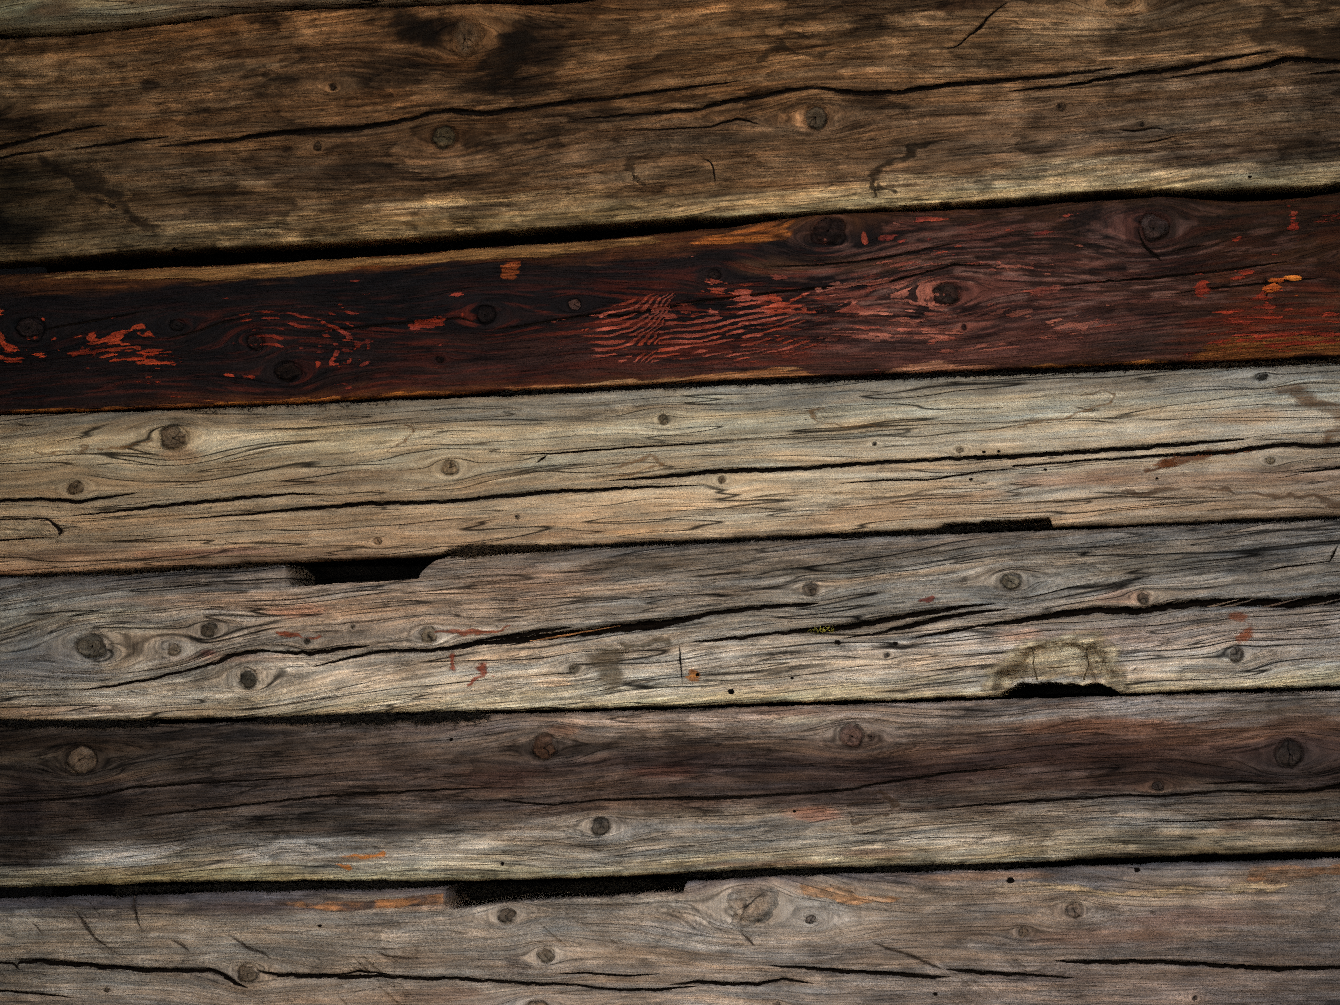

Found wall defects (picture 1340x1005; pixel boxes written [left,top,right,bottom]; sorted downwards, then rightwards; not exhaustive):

crack [947,2,1007,49]
crack [0,51,1340,180]
peeling [48,236,660,282]
peeling [691,219,795,244]
peeling [0,332,56,363]
peeling [67,318,176,383]
peeling [238,304,373,368]
peeling [511,224,1117,391]
peeling [1184,274,1340,362]
crack [0,439,1340,541]
crack [84,546,1340,690]
crack [0,958,1340,998]